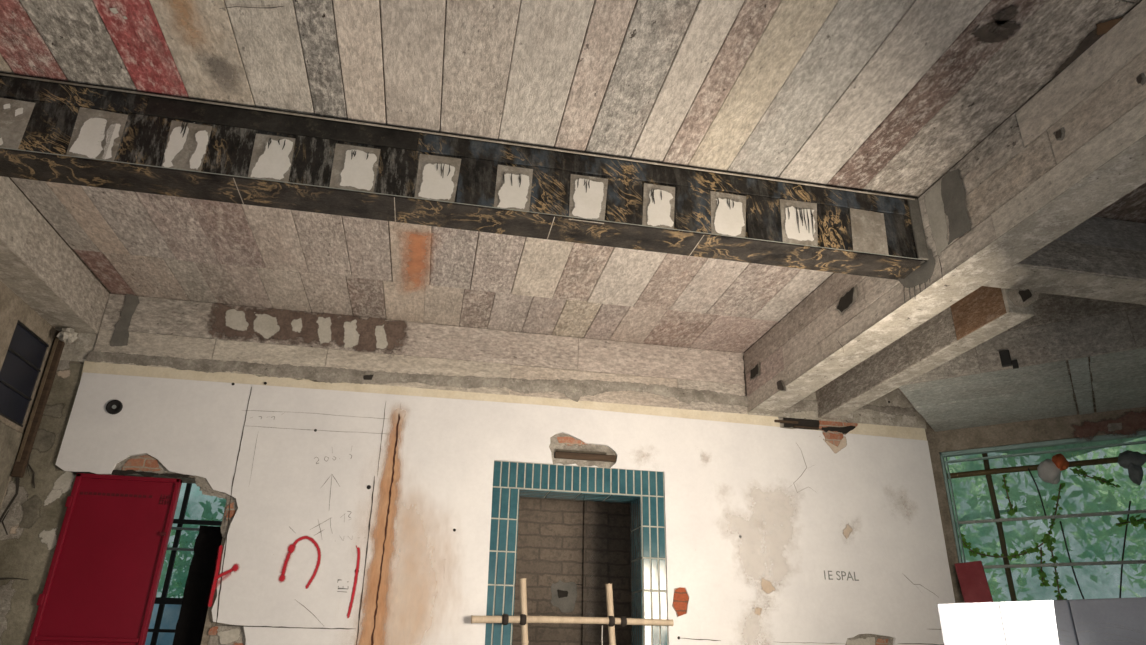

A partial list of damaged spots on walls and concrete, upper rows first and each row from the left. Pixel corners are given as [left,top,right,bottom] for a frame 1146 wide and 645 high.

spalling [971,5,1020,43]
flaking render [549,433,616,468]
flaking render [778,417,858,453]
flaking render [111,454,238,538]
corrosion [359,410,429,645]
peeling [761,578,775,594]
flaking render [208,624,246,645]